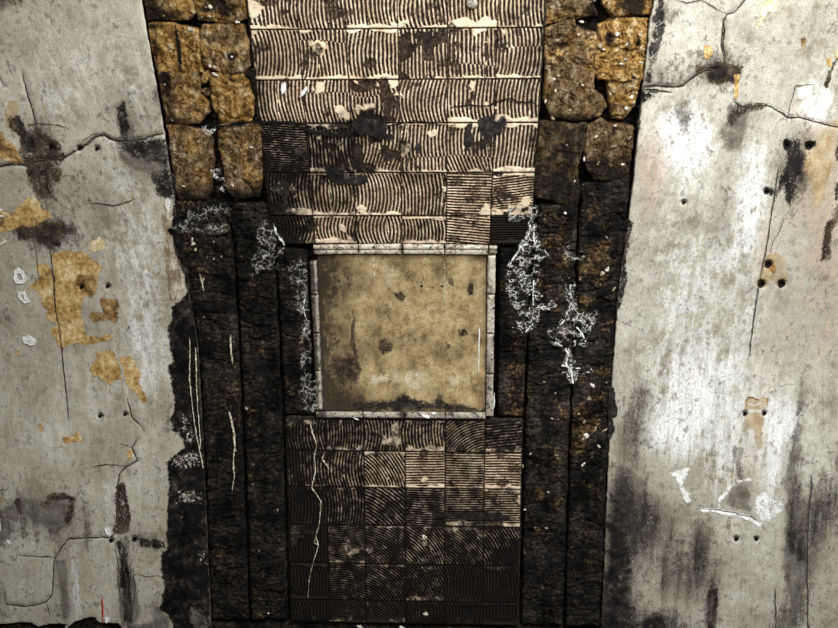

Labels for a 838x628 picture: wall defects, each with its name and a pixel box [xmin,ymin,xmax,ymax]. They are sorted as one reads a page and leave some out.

crack [641,0,745,92]
peeling [0,100,23,165]
crack [0,74,163,167]
crack [734,84,838,127]
damp [765,138,817,203]
peeling [0,195,51,246]
damp [820,183,838,262]
damp [506,206,557,333]
peeling [13,236,147,404]
damp [113,100,224,628]
damp [548,284,597,384]
crack [7,398,163,626]